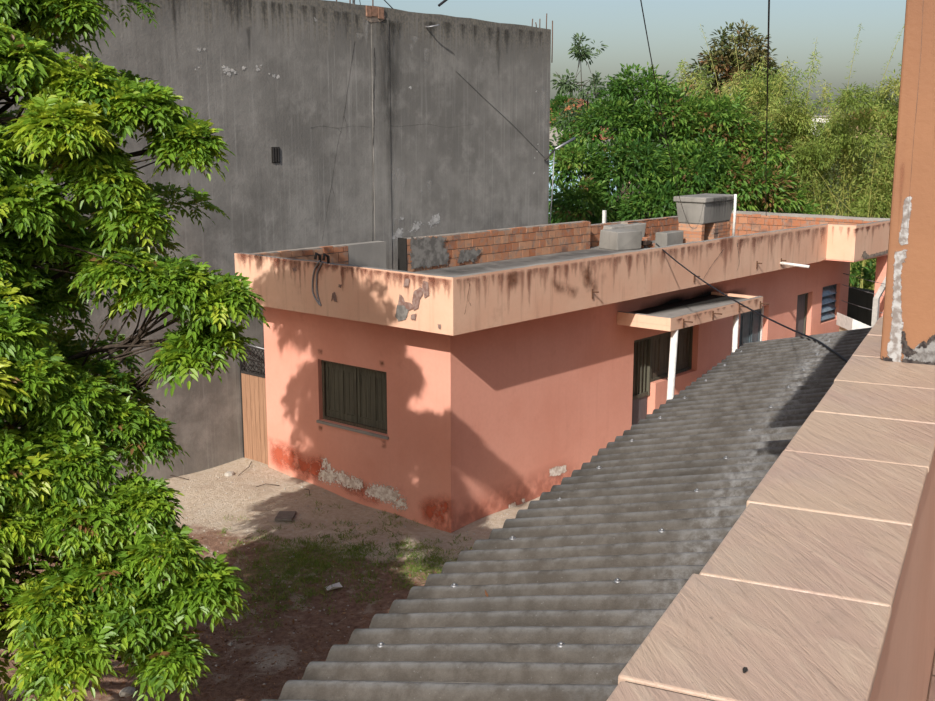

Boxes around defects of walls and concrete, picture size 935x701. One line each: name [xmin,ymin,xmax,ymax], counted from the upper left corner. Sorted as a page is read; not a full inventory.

water stain [347,267,448,286]
peeling [392,213,482,321]
water stain [631,289,757,320]
peeling [861,196,935,365]
water stain [272,446,409,512]